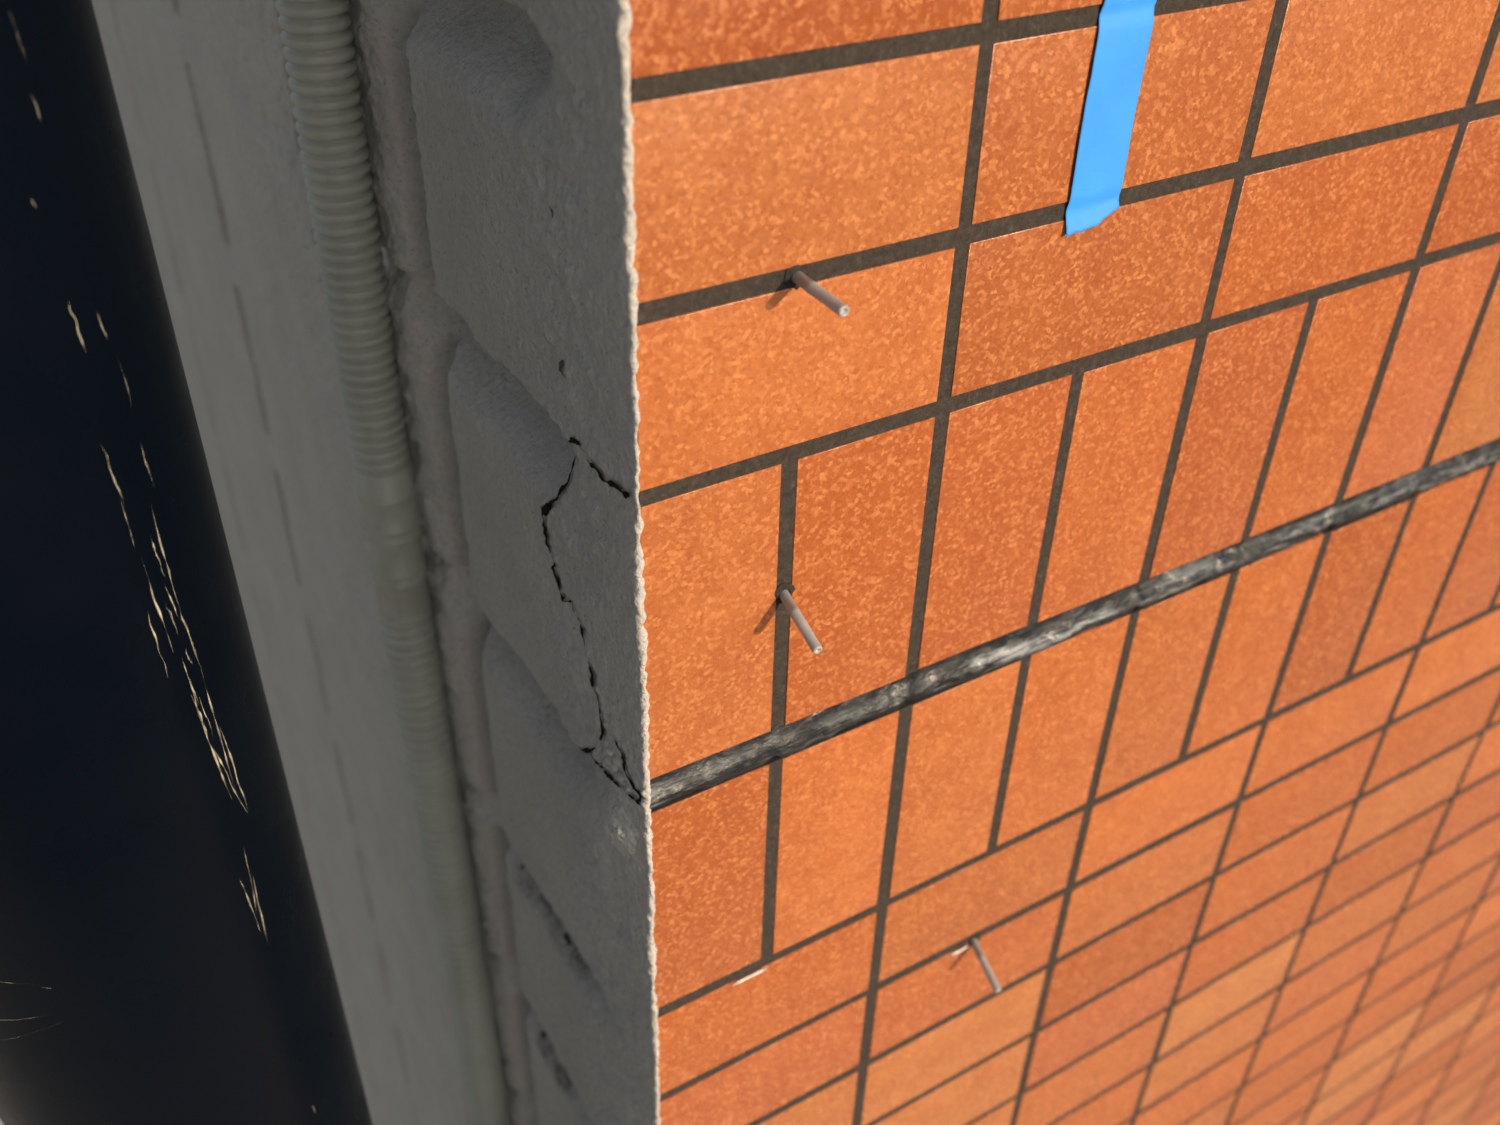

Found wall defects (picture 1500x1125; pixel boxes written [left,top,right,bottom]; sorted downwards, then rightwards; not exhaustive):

crack [541,437,642,806]